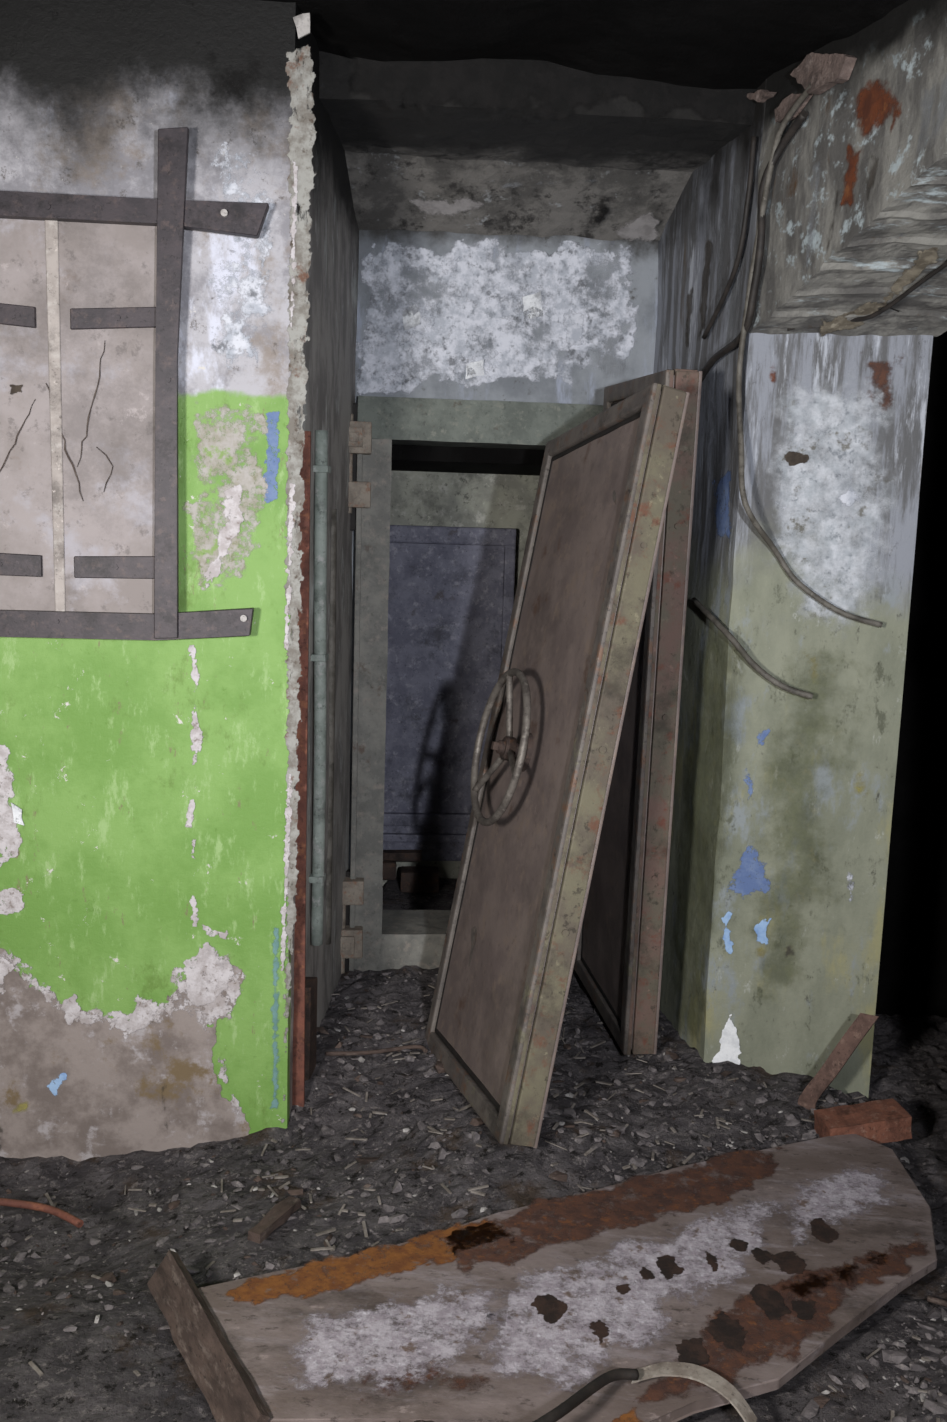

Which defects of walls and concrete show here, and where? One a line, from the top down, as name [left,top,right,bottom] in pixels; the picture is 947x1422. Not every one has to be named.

corrosion [840,80,901,206]
crack [0,383,50,471]
crack [62,342,113,500]
flaking render [183,13,317,1123]
peeling [0,745,24,867]
peeling [0,888,24,915]
peeling [721,912,734,954]
peeling [727,846,770,896]
peeling [754,918,772,945]
peeling [0,896,251,1161]